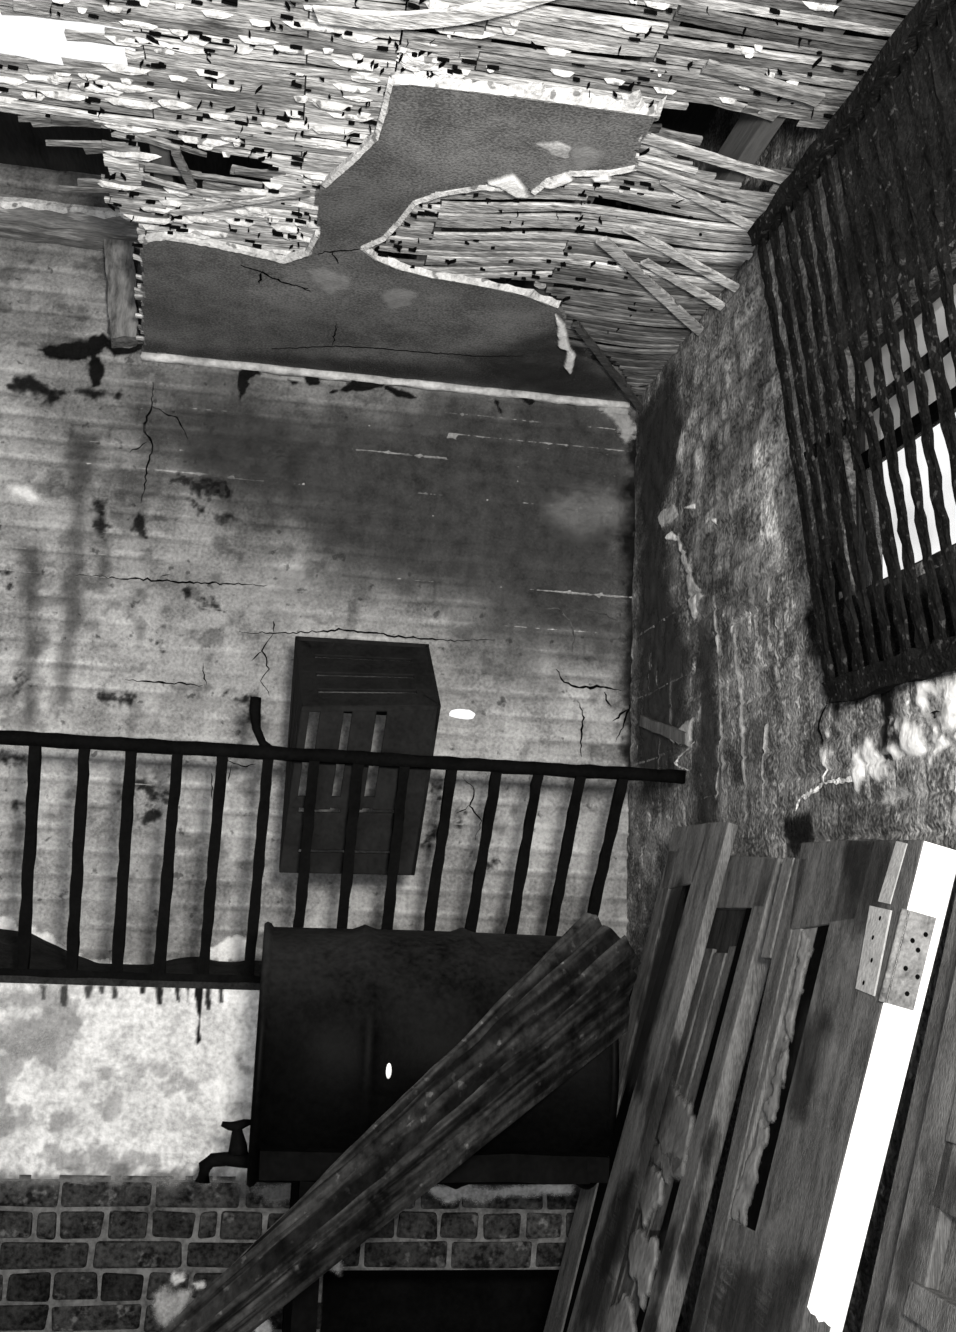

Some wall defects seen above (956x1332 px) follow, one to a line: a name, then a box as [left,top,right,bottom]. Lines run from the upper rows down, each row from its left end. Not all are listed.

flaking render [0,0,919,621]
leakage [71,436,94,498]
crack [130,386,188,501]
leakage [22,551,36,601]
leakage [64,565,80,630]
crack [76,574,266,586]
crack [125,667,207,687]
crack [239,621,489,693]
leakage [851,680,956,791]